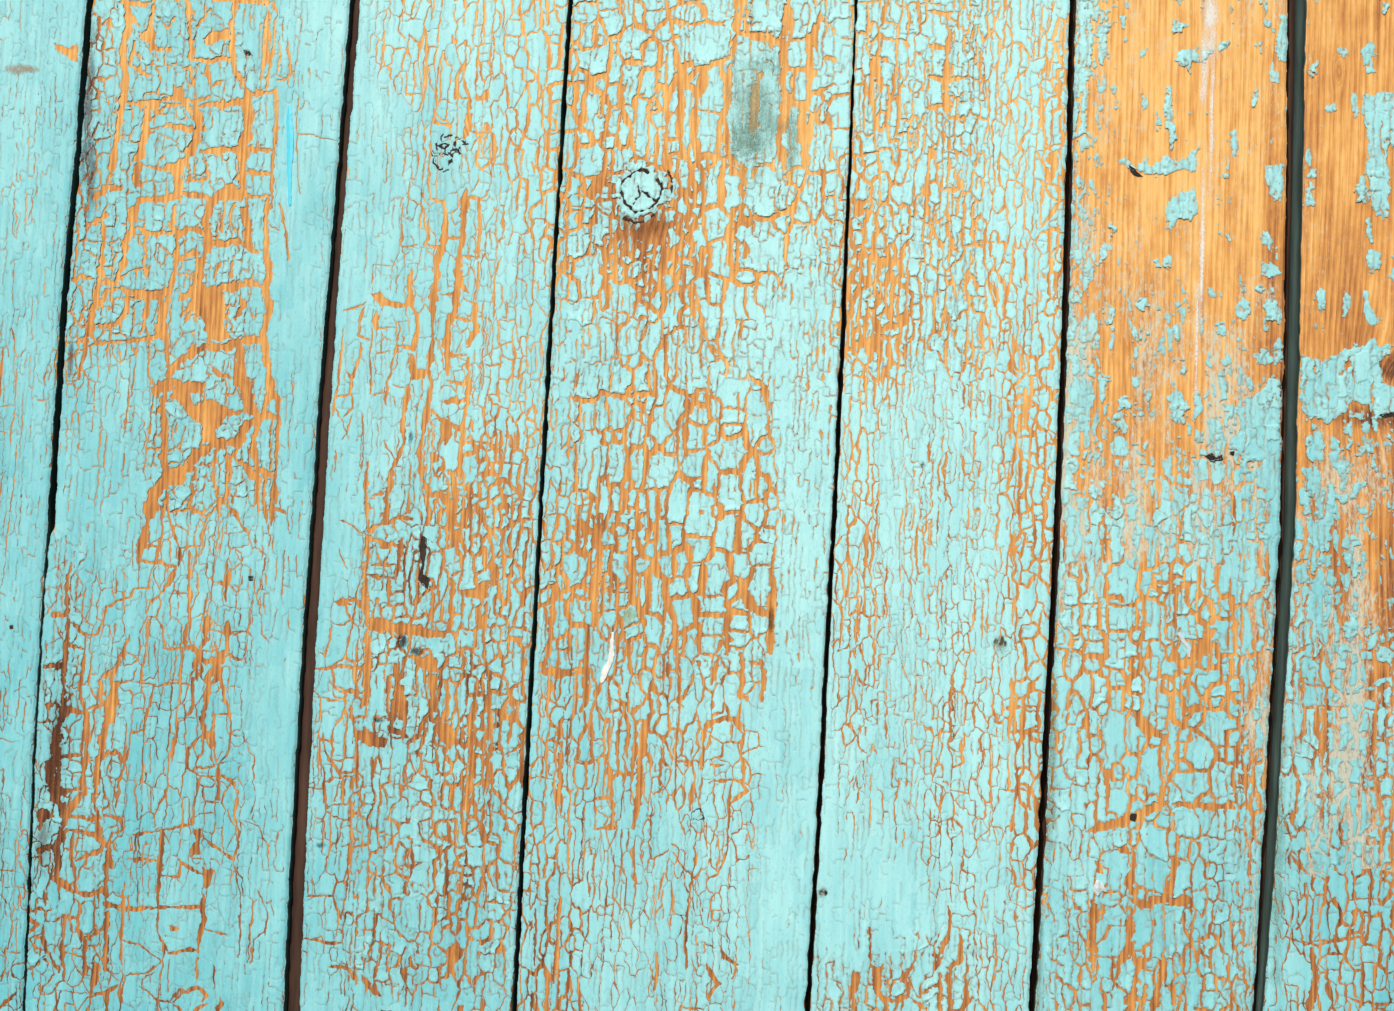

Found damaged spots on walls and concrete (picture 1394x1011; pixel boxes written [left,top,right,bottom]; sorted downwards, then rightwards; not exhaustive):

peeling [54,0,288,530]
crack [0,0,568,1011]
peeling [326,0,999,1011]
crack [439,0,1069,1011]
peeling [1035,0,1394,1011]
crack [1264,875,1394,1011]